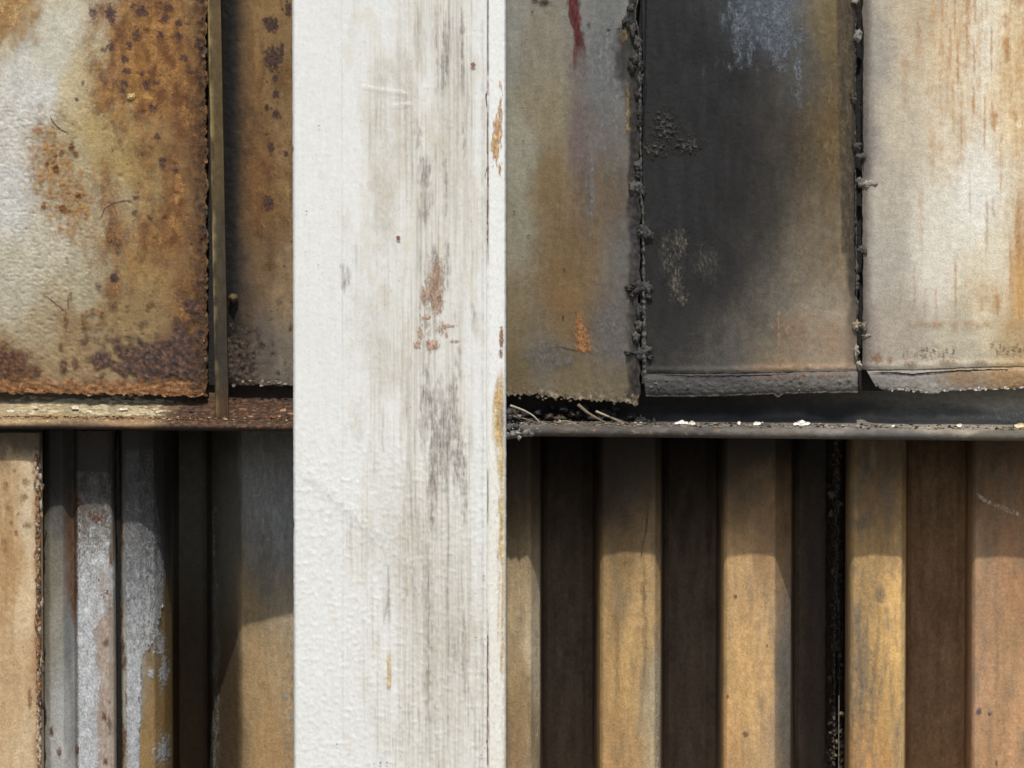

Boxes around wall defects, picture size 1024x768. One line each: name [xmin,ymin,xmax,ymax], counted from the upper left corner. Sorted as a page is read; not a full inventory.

corrosion [0,0,293,429]
corrosion [562,315,594,352]
peeling [76,508,171,768]